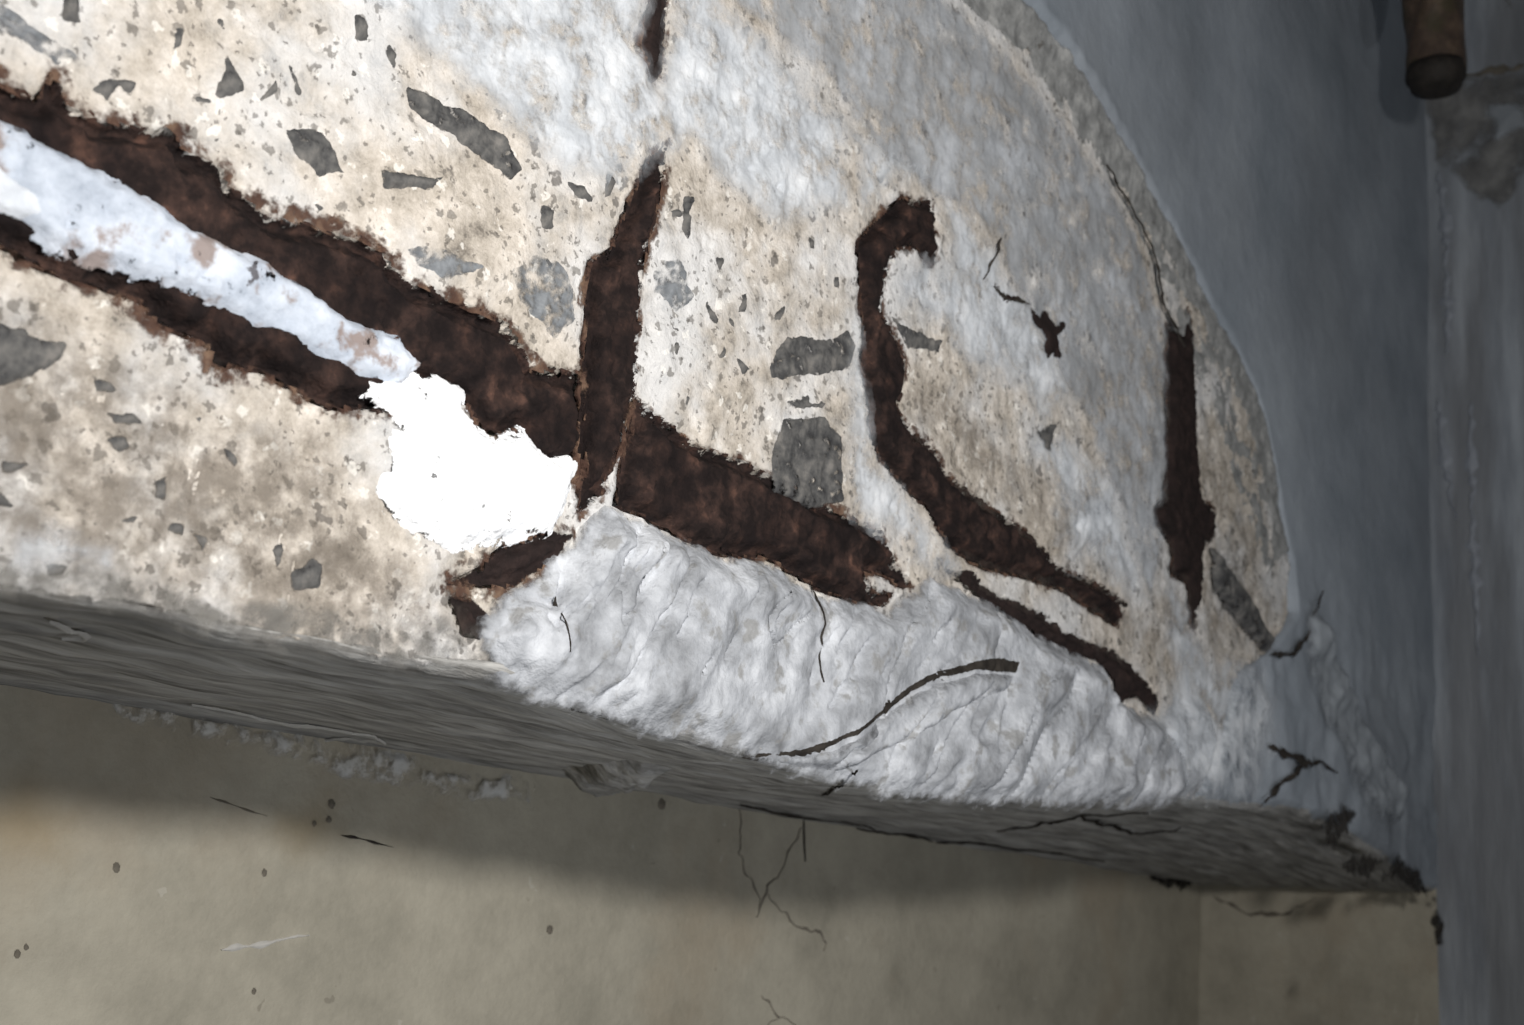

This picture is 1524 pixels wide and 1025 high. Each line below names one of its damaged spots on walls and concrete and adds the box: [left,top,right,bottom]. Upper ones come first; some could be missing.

corrosion [0,64,141,128]
corrosion [633,0,670,87]
peeling [1426,74,1524,203]
corrosion [859,191,934,239]
corrosion [0,245,393,420]
corrosion [161,122,672,640]
spalling [0,0,1290,799]
corrosion [804,503,915,608]
corrosion [934,526,1125,627]
crack [1264,745,1339,803]
crack [738,804,1181,951]
spalling [1325,805,1437,903]